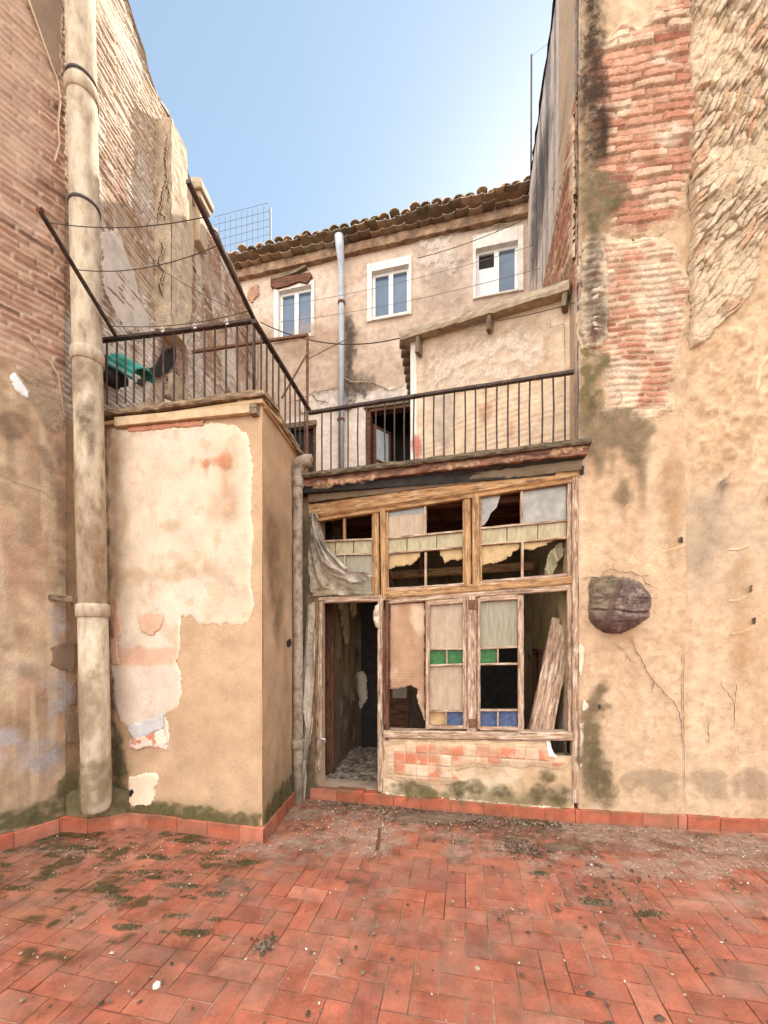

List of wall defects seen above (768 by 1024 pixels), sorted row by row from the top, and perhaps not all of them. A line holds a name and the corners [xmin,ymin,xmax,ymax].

crack [156,136,169,298]
flaking render [547,0,696,423]
flaking render [9,372,30,399]
peeling [108,420,255,751]
water stain [78,761,120,811]
spalling [128,772,159,807]
crack [615,642,710,808]